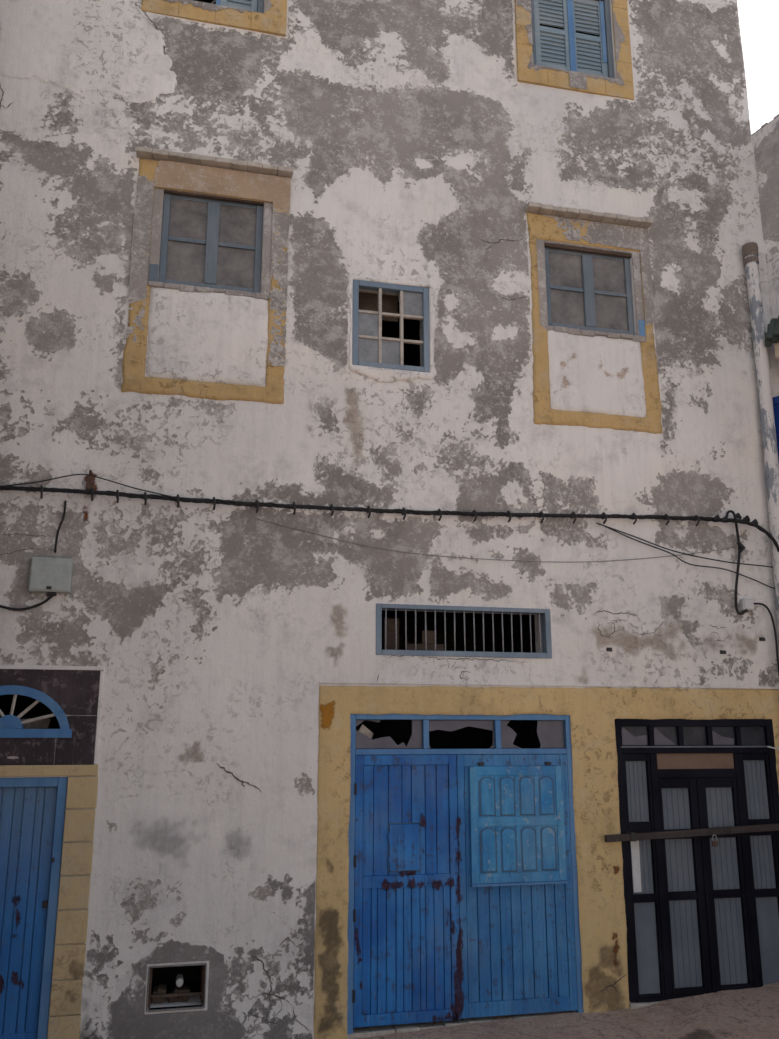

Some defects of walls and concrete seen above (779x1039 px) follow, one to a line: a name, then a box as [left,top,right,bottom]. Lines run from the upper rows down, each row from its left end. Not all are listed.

peeling [554,0,779,564]
peeling [0,0,609,691]
peeling [657,582,779,687]
crack [218,764,261,792]
peeling [294,772,315,797]
rust [0,971,24,994]
spalling [83,867,315,1039]
damp [319,911,340,1031]